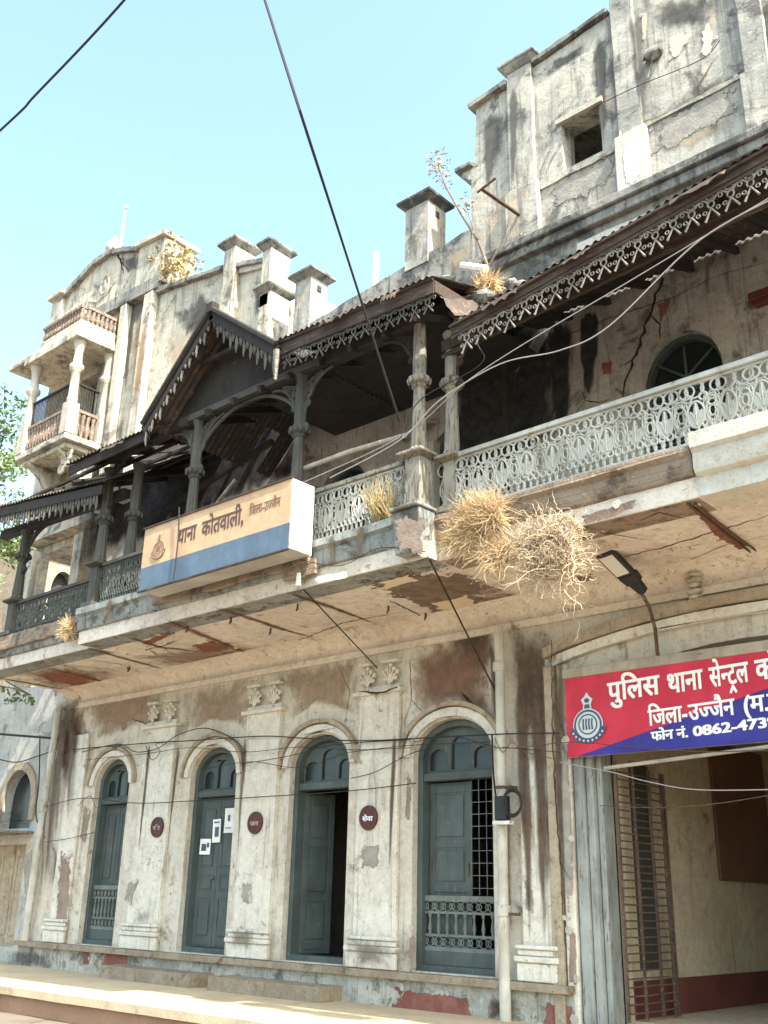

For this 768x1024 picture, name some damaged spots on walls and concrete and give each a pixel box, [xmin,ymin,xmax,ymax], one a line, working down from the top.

peeling [700,23,718,57]
water stain [485,90,517,182]
water stain [549,313,598,430]
crack [570,262,766,413]
peeling [394,516,429,554]
water stain [478,590,512,602]
water stain [419,628,496,720]
water stain [507,642,564,922]
peeling [49,846,73,927]
peeling [242,883,252,903]
peeling [358,845,379,868]
peeling [386,983,471,1016]